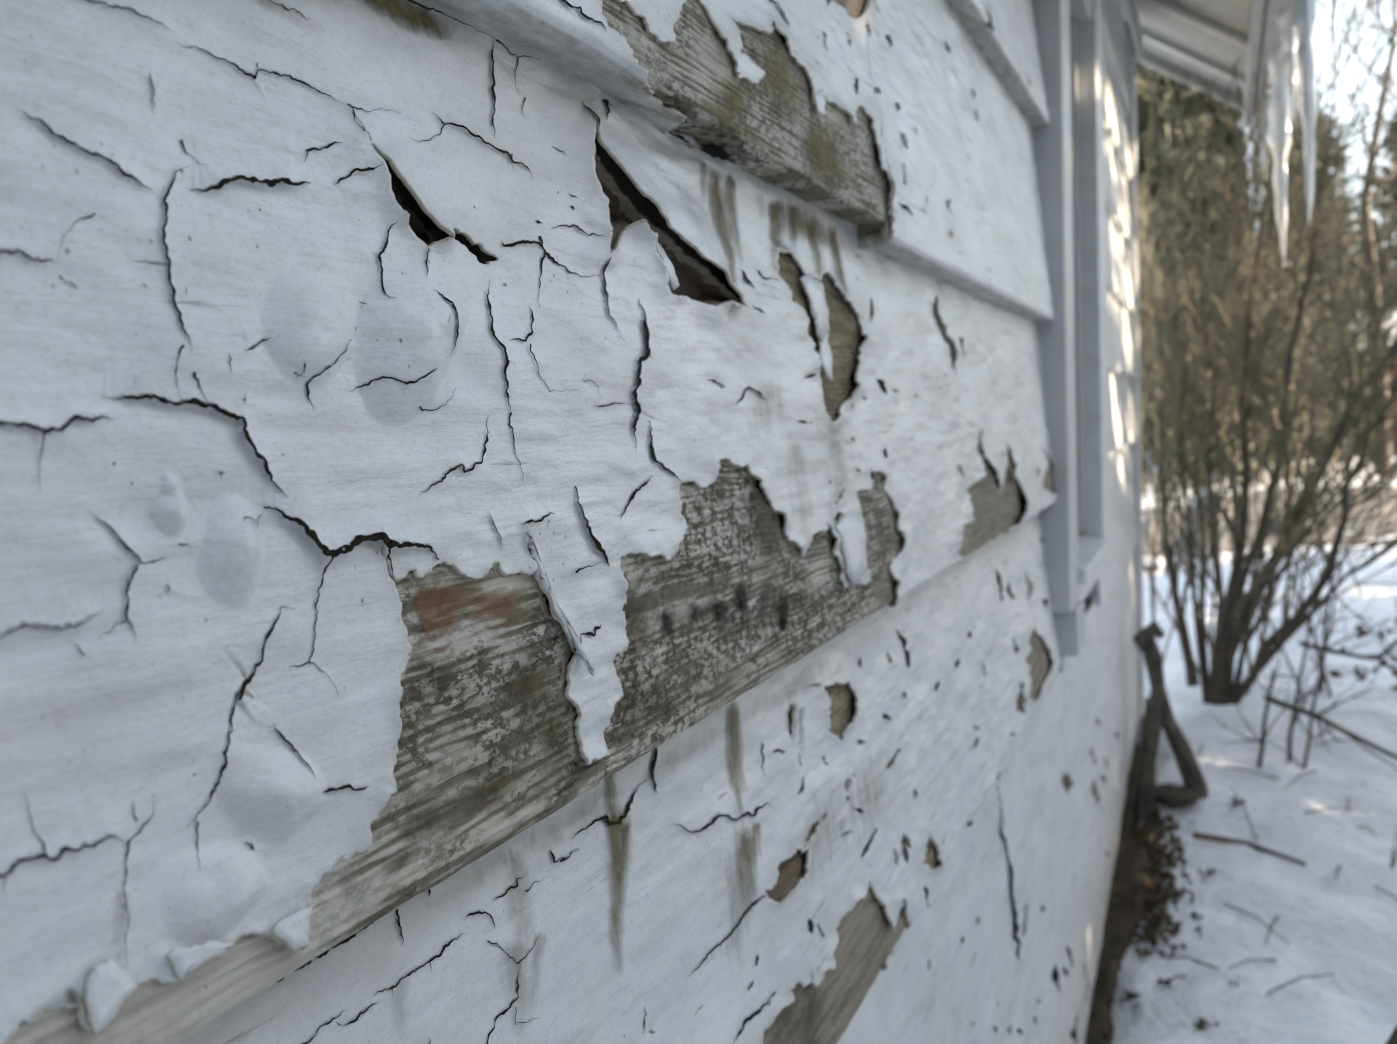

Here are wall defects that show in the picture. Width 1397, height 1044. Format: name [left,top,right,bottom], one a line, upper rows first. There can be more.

peeling [595,149,765,313]
leakage [728,178,736,225]
peeling [602,0,927,241]
leakage [788,207,846,292]
crack [0,0,542,869]
crack [294,220,684,573]
peeling [778,252,874,421]
peeling [957,438,1024,557]
peeling [5,448,910,1044]
crack [275,747,658,1044]
crack [678,743,771,833]
leakage [739,825,759,884]